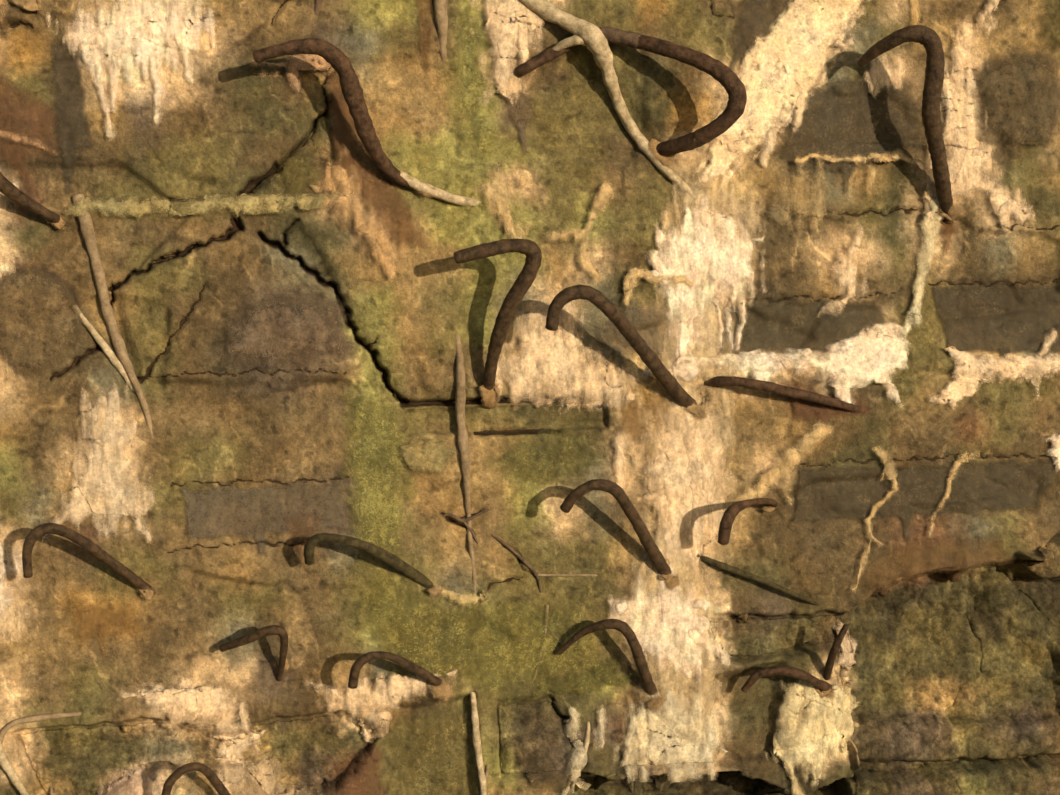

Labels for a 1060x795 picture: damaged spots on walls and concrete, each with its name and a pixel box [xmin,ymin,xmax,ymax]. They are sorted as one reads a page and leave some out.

rust [0,80,53,191]
leakage [53,3,215,193]
leakage [251,54,333,91]
rust [328,74,424,245]
leakage [65,162,397,279]
crack [109,72,607,407]
crack [50,345,102,380]
leakage [55,390,153,542]
crack [473,428,559,436]
leakage [495,302,653,408]
leakage [610,0,1060,795]
leakage [563,708,591,792]